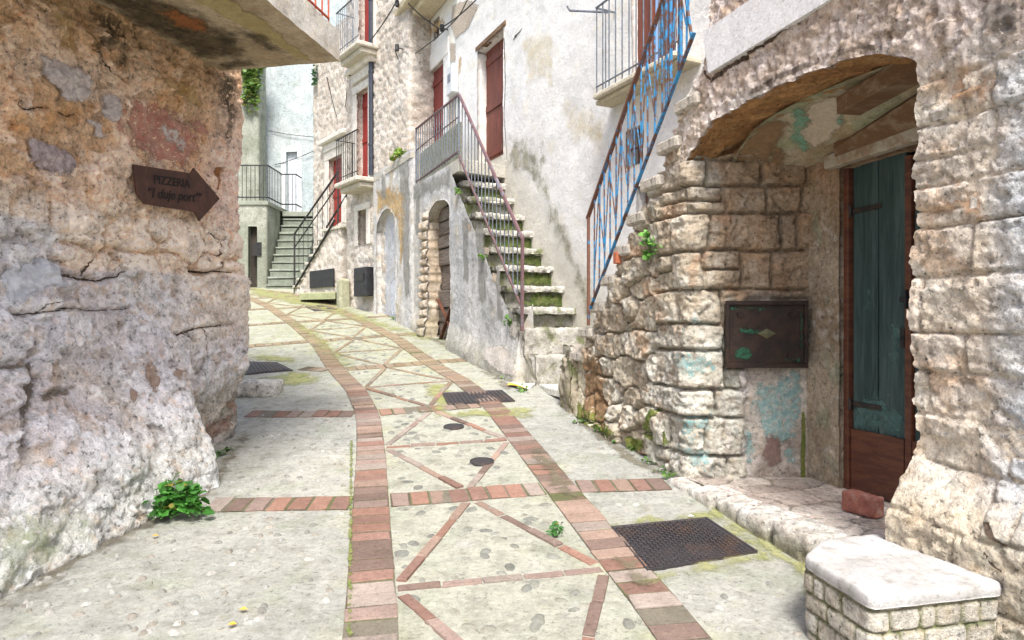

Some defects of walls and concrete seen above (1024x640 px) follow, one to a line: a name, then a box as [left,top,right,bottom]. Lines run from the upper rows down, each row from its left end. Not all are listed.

water stain [94,0,311,142]
water stain [512,145,547,196]
peeling [788,97,844,151]
peeling [726,313,803,475]